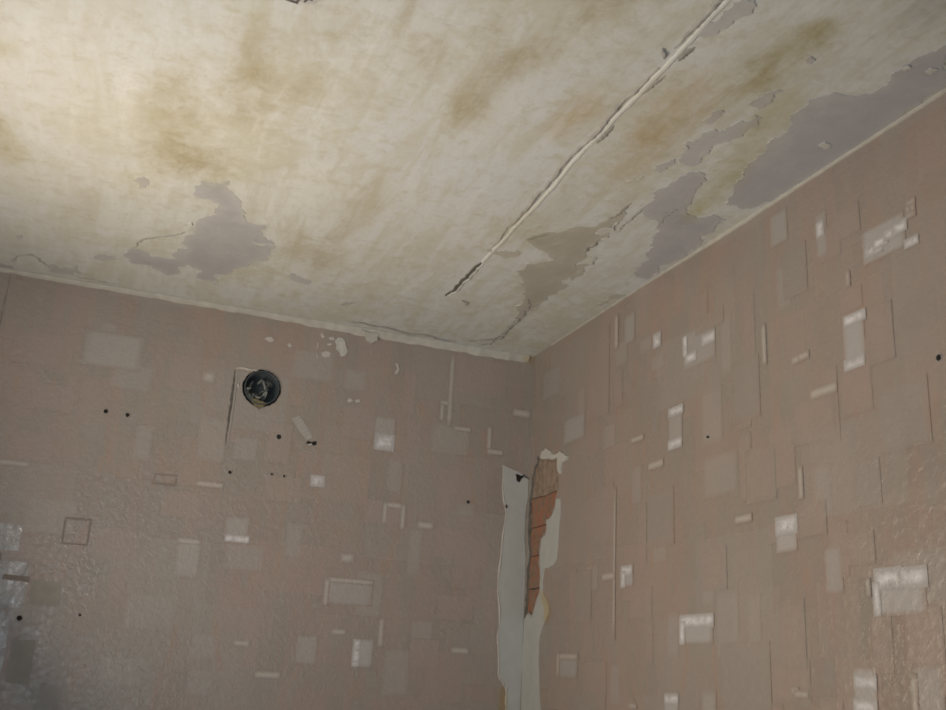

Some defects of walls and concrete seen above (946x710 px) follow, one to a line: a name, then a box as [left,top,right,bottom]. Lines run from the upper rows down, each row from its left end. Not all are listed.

peeling [698,0,756,38]
peeling [89,181,276,282]
crack [445,0,722,306]
peeling [469,90,783,341]
peeling [725,45,946,209]
crack [342,299,532,345]
flaking render [498,448,568,710]